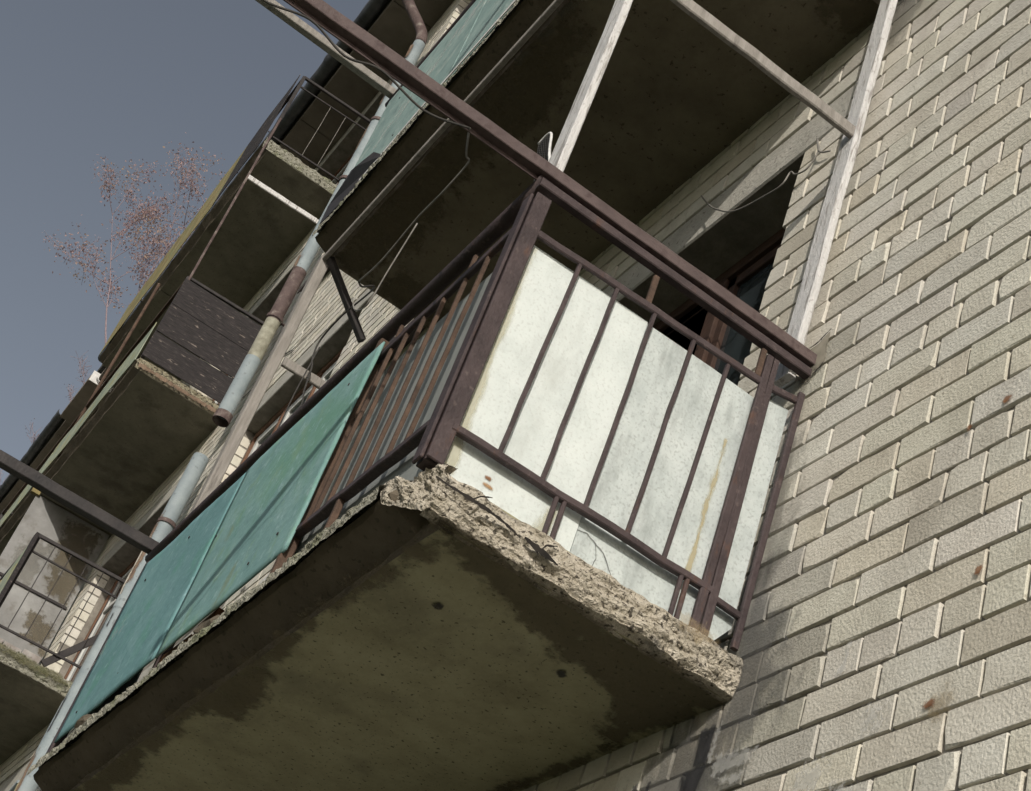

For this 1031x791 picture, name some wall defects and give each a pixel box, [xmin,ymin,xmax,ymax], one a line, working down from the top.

spalling [442,0,523,89]
spalling [262,102,431,238]
rust [686,470,718,572]
spalling [14,463,744,791]
damp [73,520,725,791]